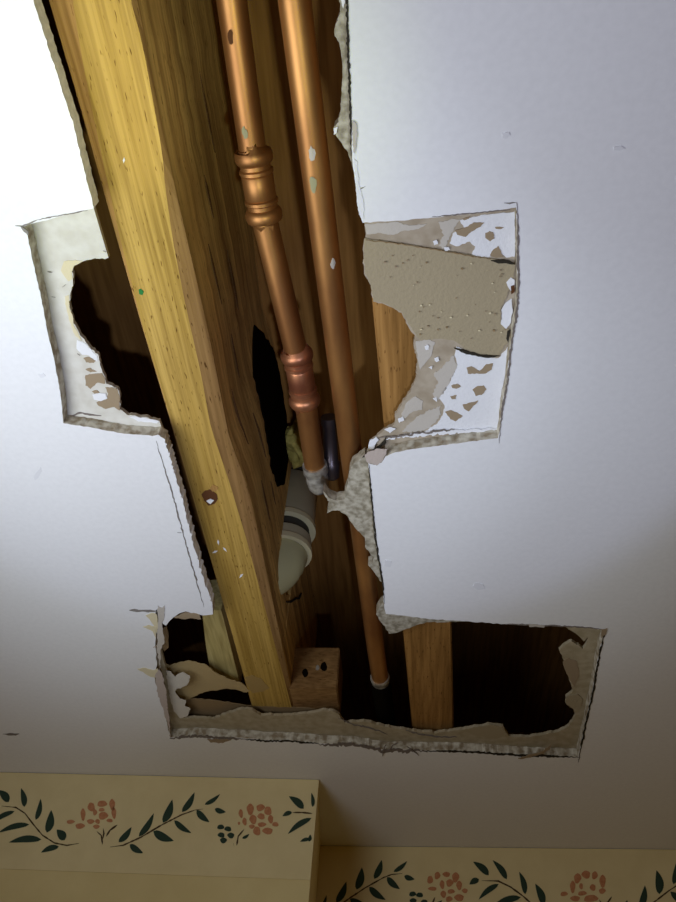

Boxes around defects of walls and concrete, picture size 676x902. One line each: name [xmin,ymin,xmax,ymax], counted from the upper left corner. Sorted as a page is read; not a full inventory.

peeling [352,121,364,219]
peeling [501,278,515,329]
spalling [365,416,404,465]
spalling [138,605,171,738]